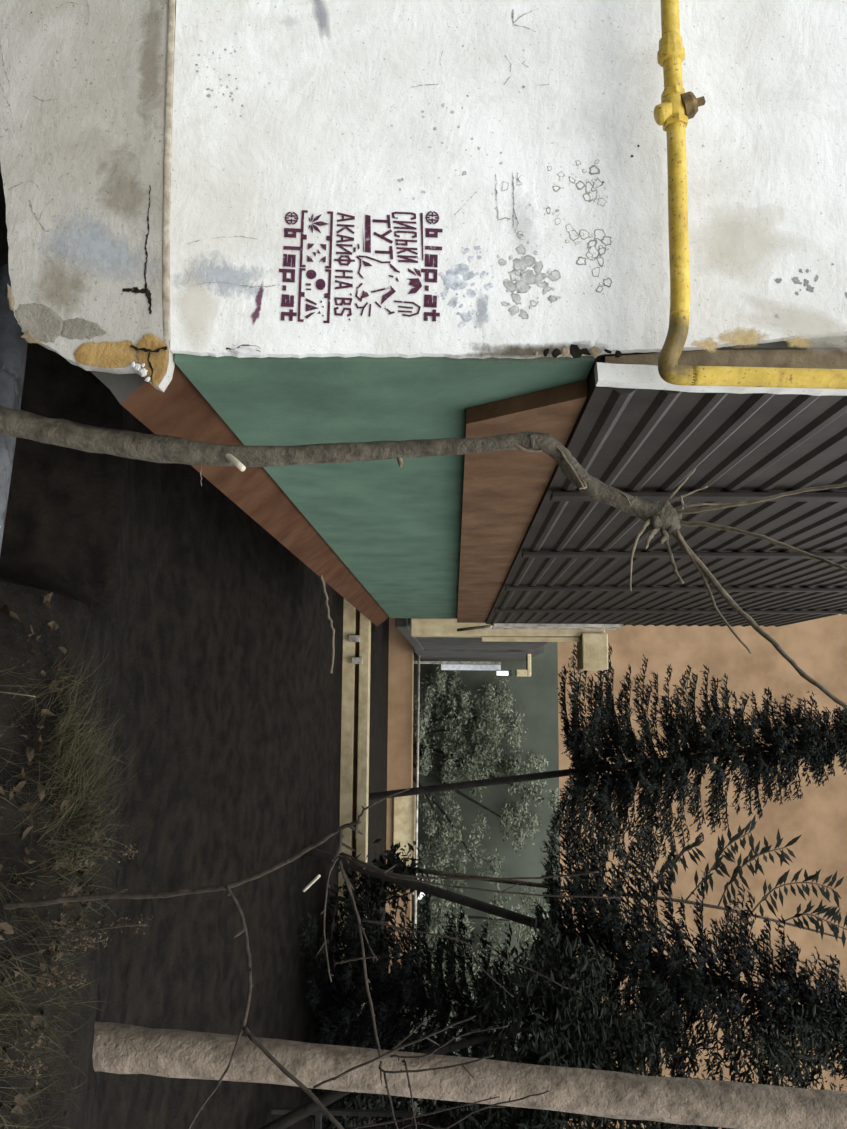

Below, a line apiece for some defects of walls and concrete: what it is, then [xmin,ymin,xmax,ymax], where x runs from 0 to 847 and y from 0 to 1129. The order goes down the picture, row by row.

leakage [317,3,326,27]
crack [122,185,152,314]
spalling [7,284,169,387]